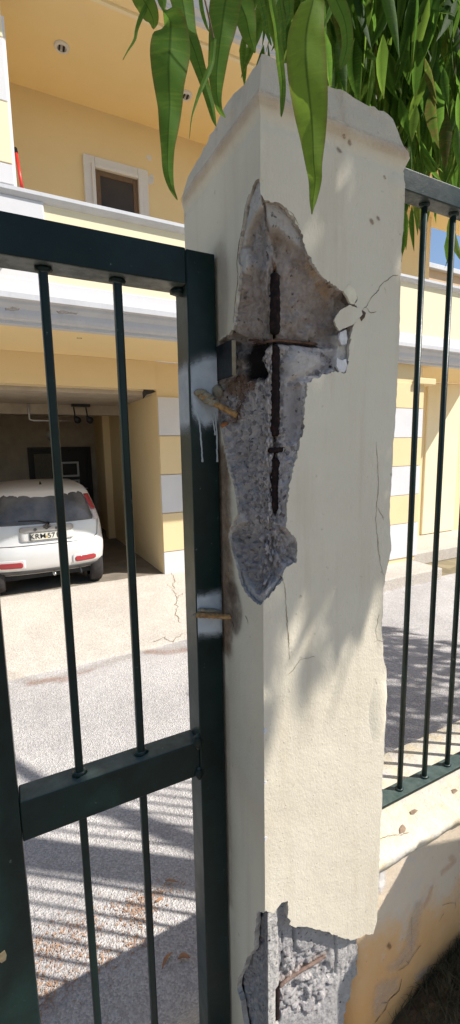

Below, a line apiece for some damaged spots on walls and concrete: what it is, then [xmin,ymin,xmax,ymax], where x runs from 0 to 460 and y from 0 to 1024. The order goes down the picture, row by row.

spalling [218,182,366,604]
spalling [243,902,358,1024]